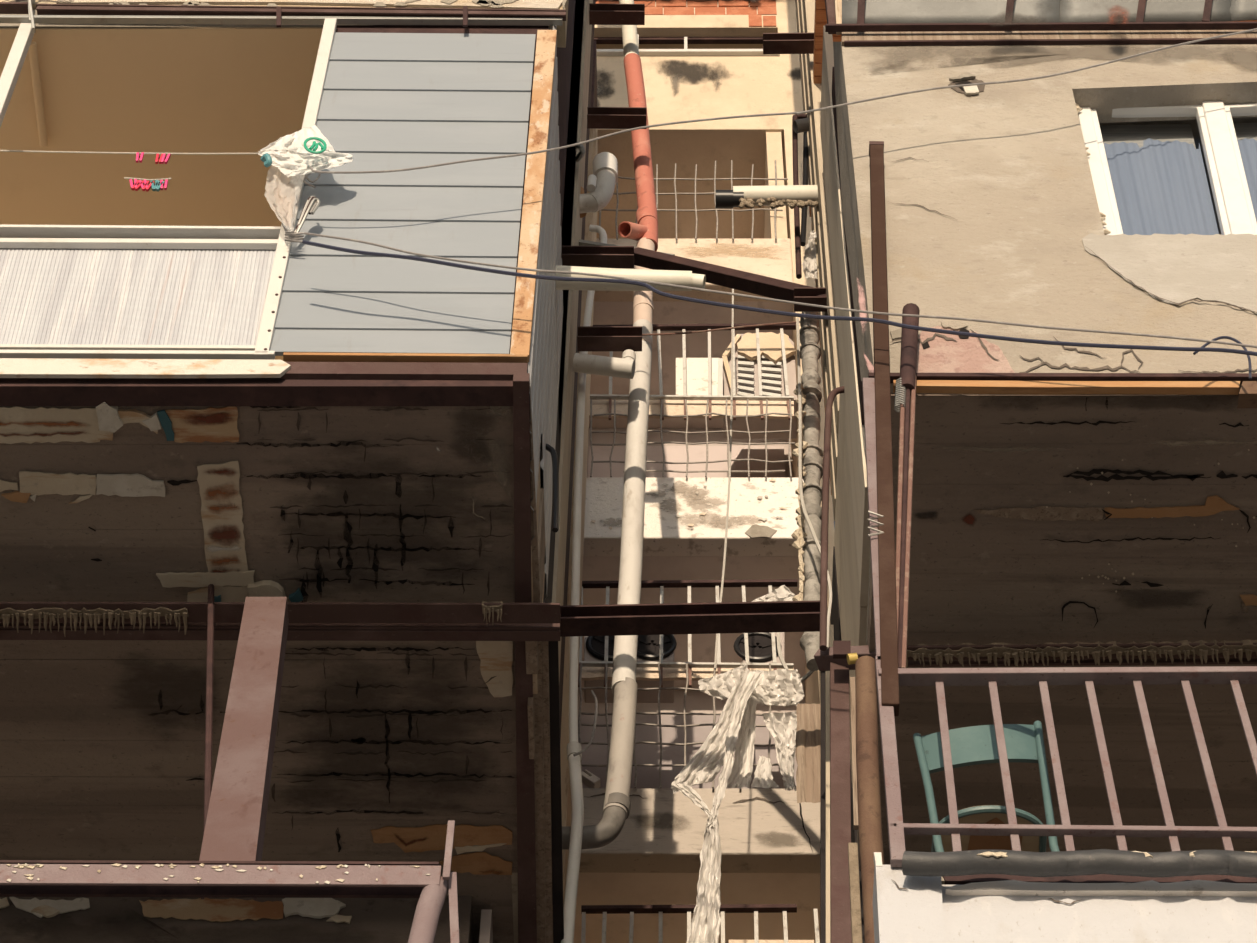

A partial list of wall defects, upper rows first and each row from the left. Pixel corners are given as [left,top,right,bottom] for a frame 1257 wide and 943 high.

water stain [662,60,726,94]
crack [1000,336,1143,426]
peeling [0,402,240,444]
peeling [0,471,165,504]
crack [1063,469,1257,482]
peeling [156,461,303,602]
crack [1043,510,1257,543]
water stain [2,612,188,637]
water stain [906,648,1257,668]
crack [271,647,514,852]
peeling [371,824,513,875]
peeling [83,863,273,883]